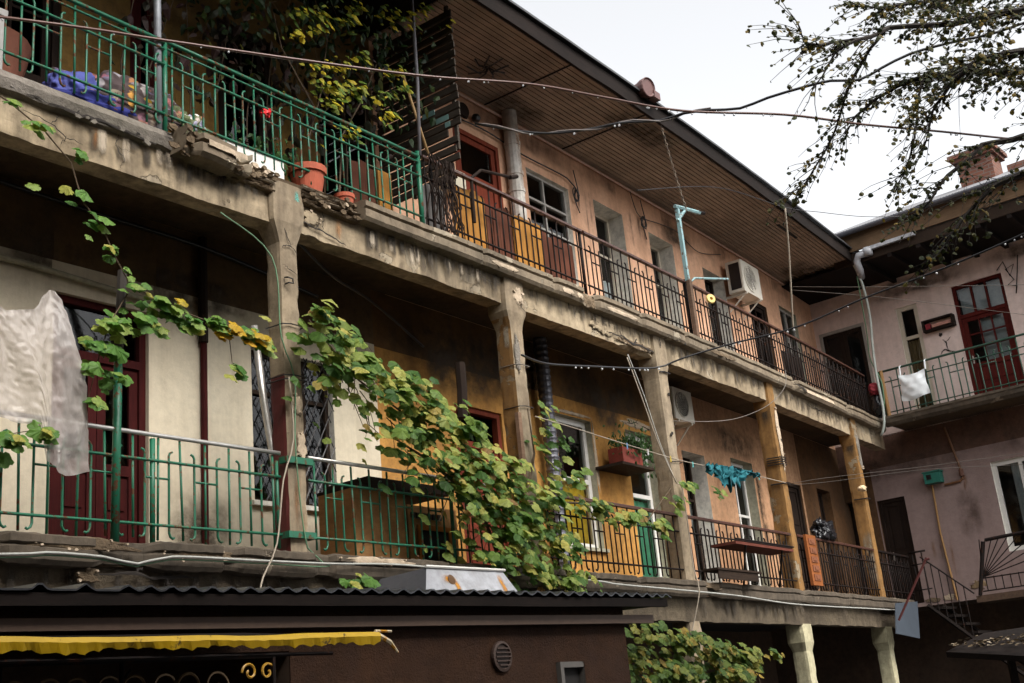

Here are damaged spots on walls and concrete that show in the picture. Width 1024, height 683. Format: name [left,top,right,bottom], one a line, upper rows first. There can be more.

water stain [91,132,106,151]
peeling [167,123,198,158]
water stain [118,143,205,181]
spalling [230,162,280,193]
spalling [300,184,362,226]